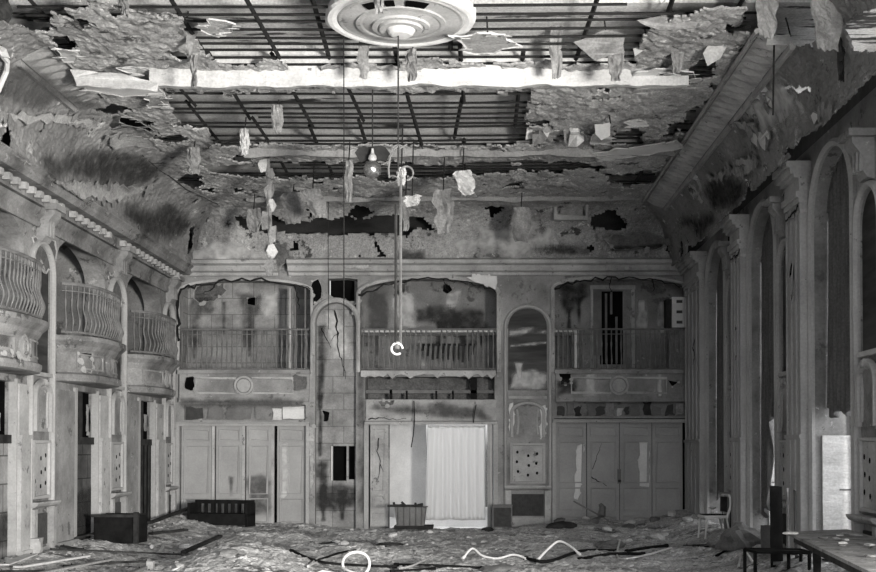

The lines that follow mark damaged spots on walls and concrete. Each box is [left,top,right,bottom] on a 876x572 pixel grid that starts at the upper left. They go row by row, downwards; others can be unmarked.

peeling [51,47,86,63]
peeling [632,68,703,86]
peeling [76,85,173,109]
peeling [0,109,98,133]
peeling [590,133,684,162]
peeling [56,179,150,208]
spalling [32,235,58,274]
spalling [274,240,297,268]
water stain [561,284,587,328]
water stain [240,293,277,355]
crack [321,310,346,379]
water stain [317,313,364,520]